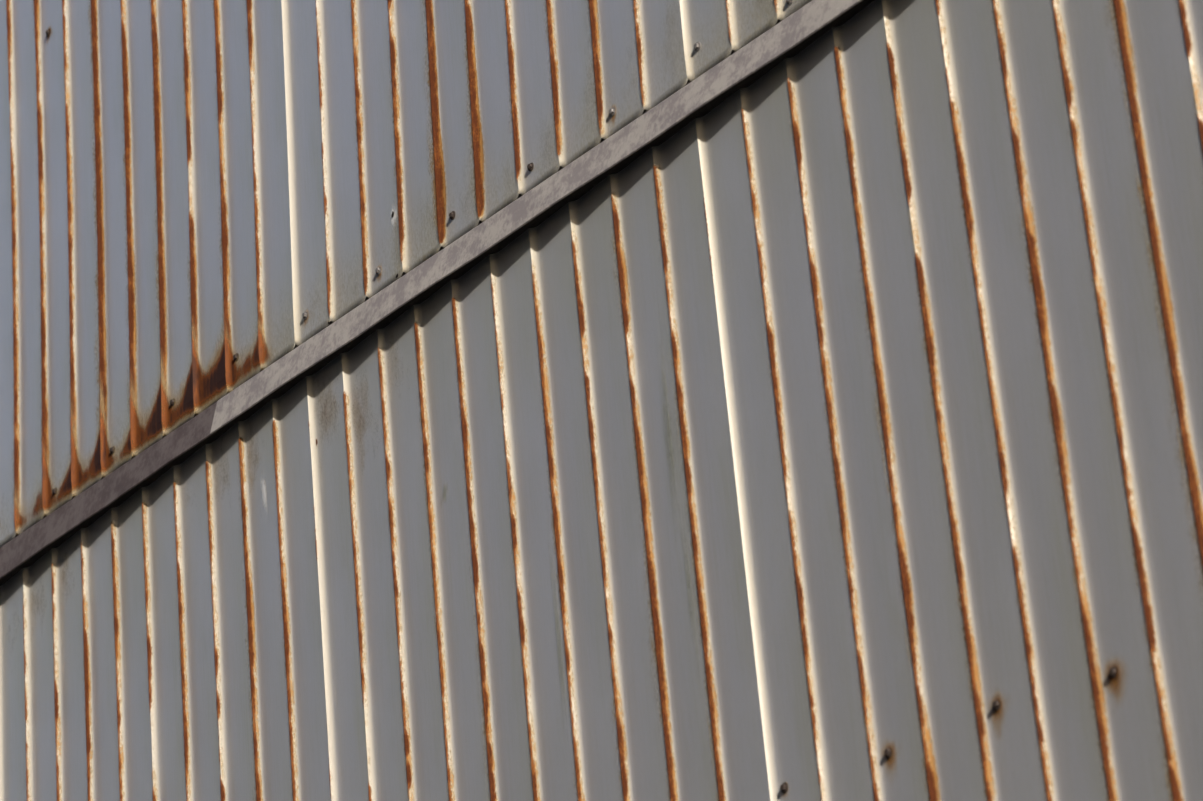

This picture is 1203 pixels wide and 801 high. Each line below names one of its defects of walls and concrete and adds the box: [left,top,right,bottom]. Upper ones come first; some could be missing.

rust [6,0,268,532]
rust [452,297,497,801]
rust [571,232,630,801]
rust [611,195,678,801]
rust [653,165,726,801]
rust [787,78,895,801]
rust [834,47,941,801]
rust [885,23,1002,801]
rust [935,0,1054,801]
rust [993,0,1121,801]
rust [1052,0,1184,801]
rust [1111,0,1203,565]